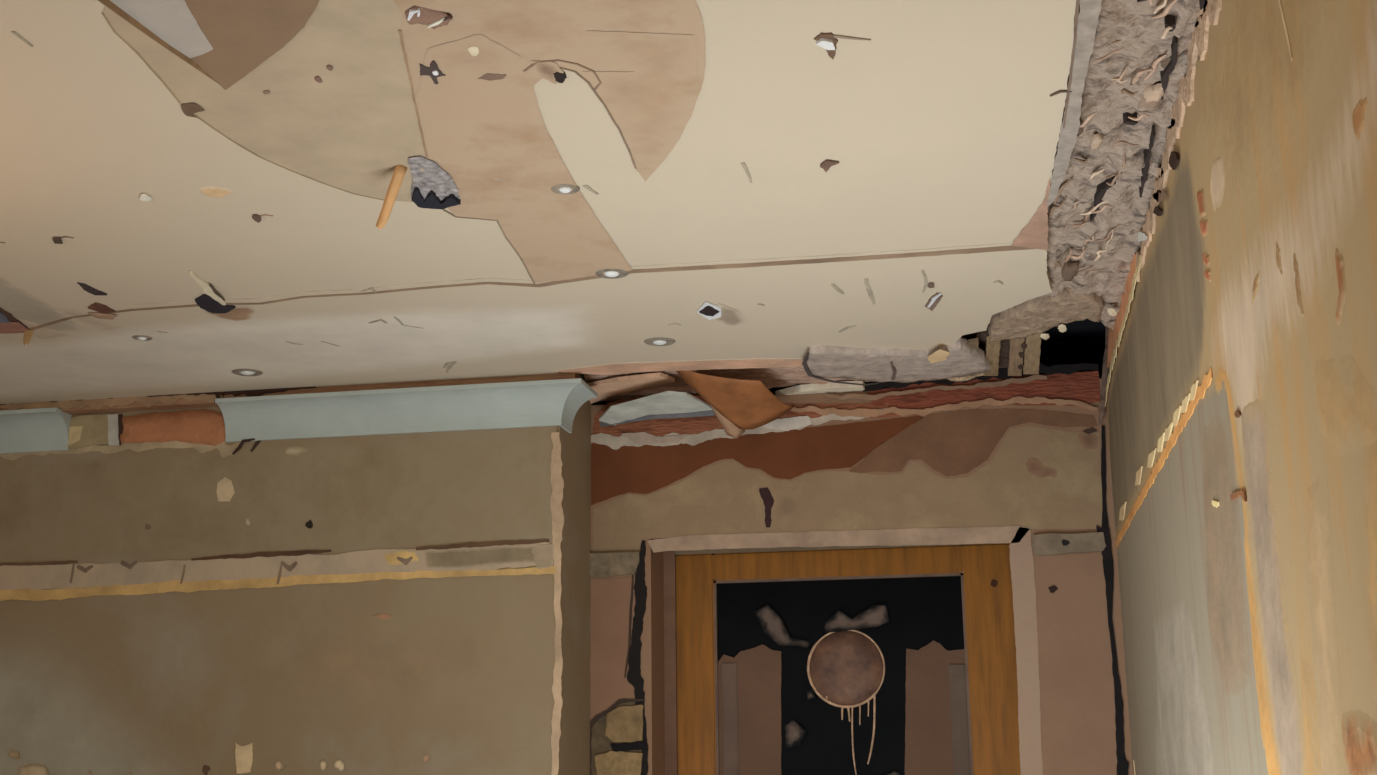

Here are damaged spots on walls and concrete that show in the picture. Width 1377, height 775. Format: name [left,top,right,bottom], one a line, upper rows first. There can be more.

peeling [102,0,706,284]
flaking render [0,307,35,346]
flaking render [235,743,253,774]
flaking render [0,394,554,590]
flaking render [319,759,345,772]
crack [624,540,648,775]
peeling [549,0,1268,775]
crack [791,362,1136,775]